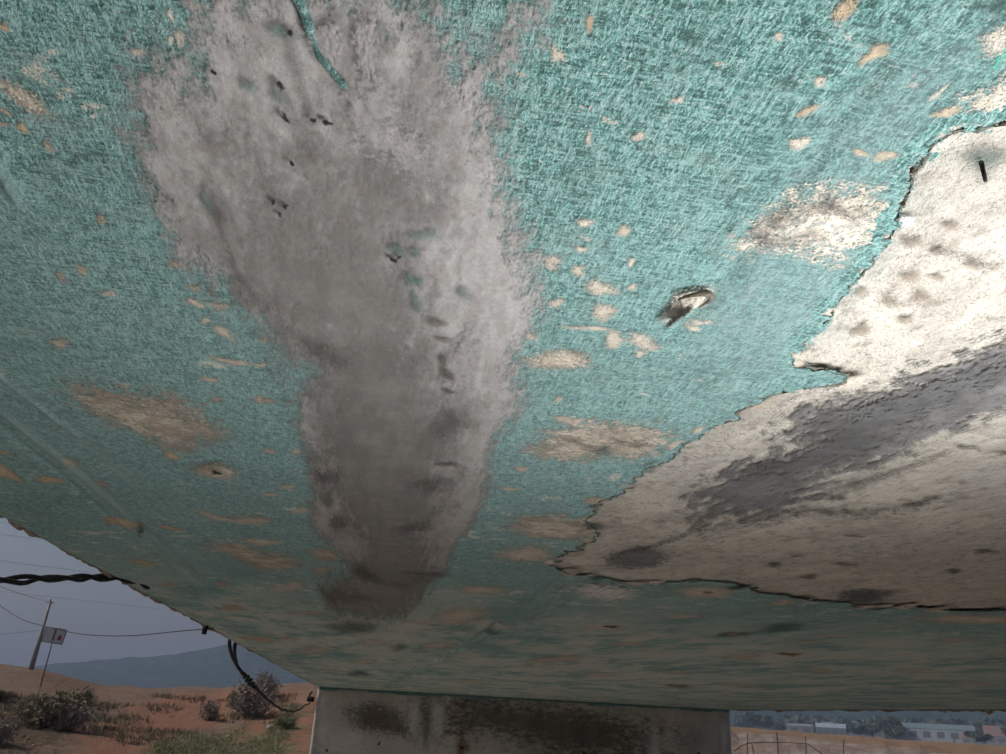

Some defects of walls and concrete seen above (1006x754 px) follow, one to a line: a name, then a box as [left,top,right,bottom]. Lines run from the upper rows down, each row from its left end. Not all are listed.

peeling [179,284,249,345]
water stain [197,45,478,622]
spalling [488,23,1006,625]
water stain [343,696,672,754]